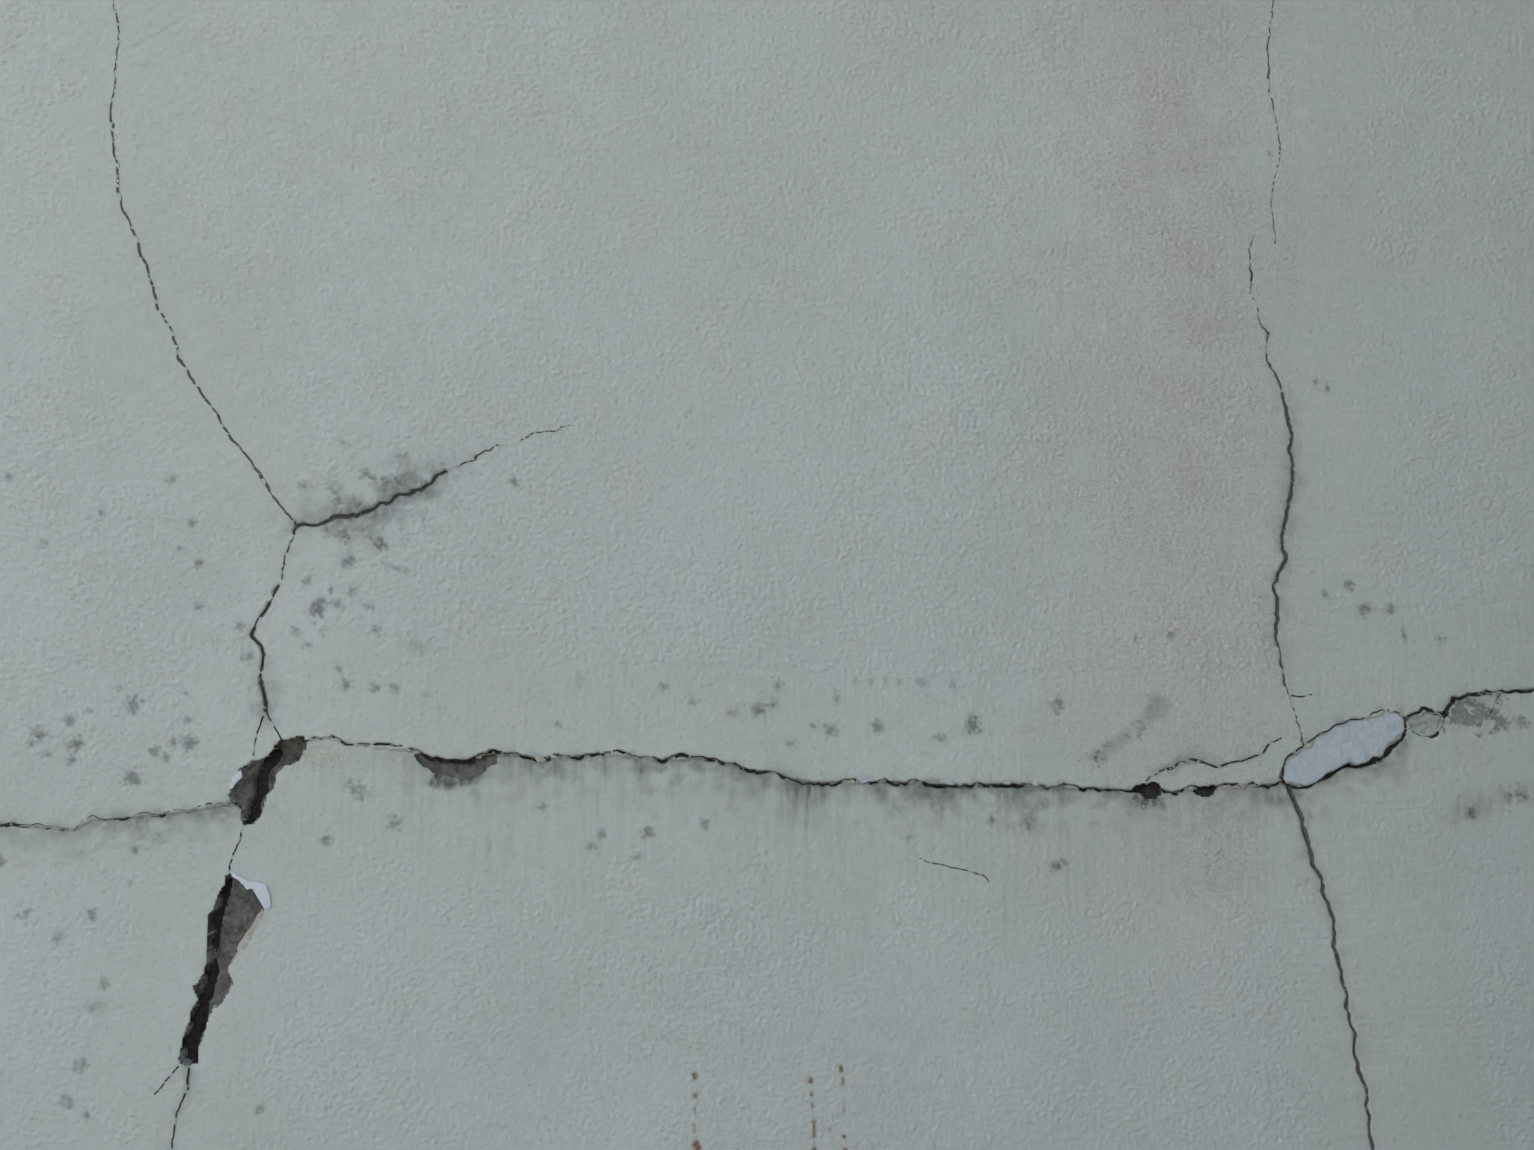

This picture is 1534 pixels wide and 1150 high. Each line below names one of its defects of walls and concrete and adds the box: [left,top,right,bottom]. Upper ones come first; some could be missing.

crack [109,0,571,755]
crack [302,0,1374,1150]
spalling [229,736,347,824]
peeling [1280,698,1510,789]
crack [1442,689,1534,721]
crack [0,802,247,872]
spalling [178,870,271,1066]
crack [154,1065,190,1149]